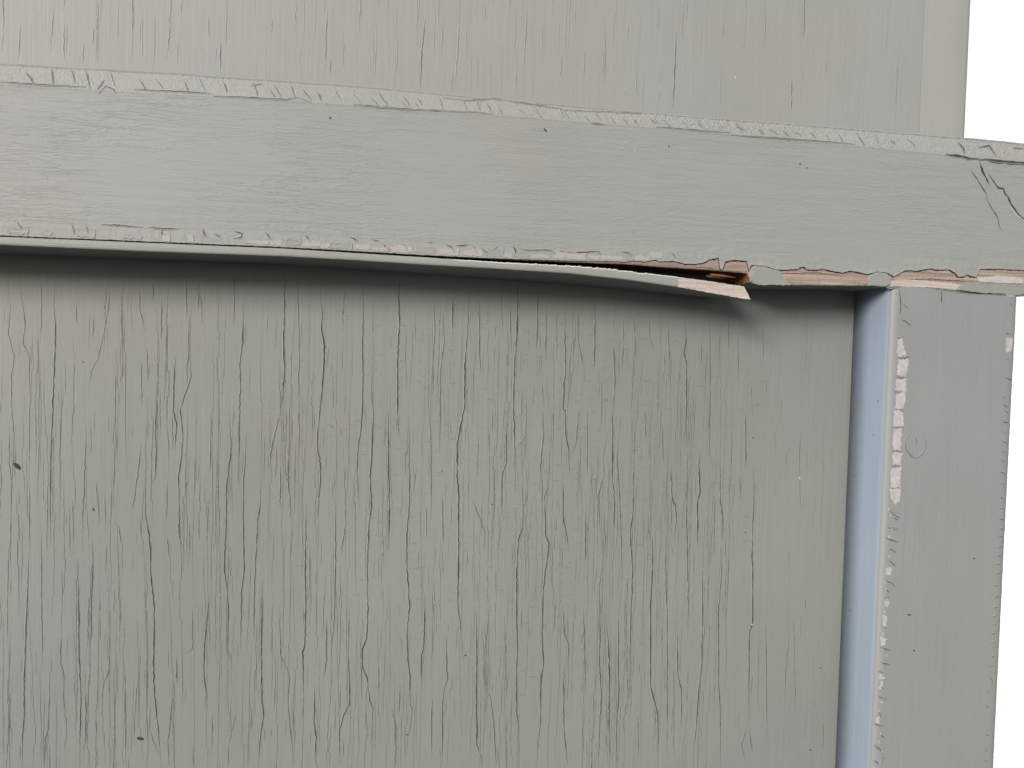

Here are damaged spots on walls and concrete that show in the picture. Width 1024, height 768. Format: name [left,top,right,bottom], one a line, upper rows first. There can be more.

crack [946,142,1024,231]
peeling [71,223,221,242]
peeling [234,230,676,261]
peeling [678,266,839,300]
peeling [867,270,1024,306]
crack [0,272,824,768]
peeling [874,303,911,765]
peeling [985,396,1009,708]